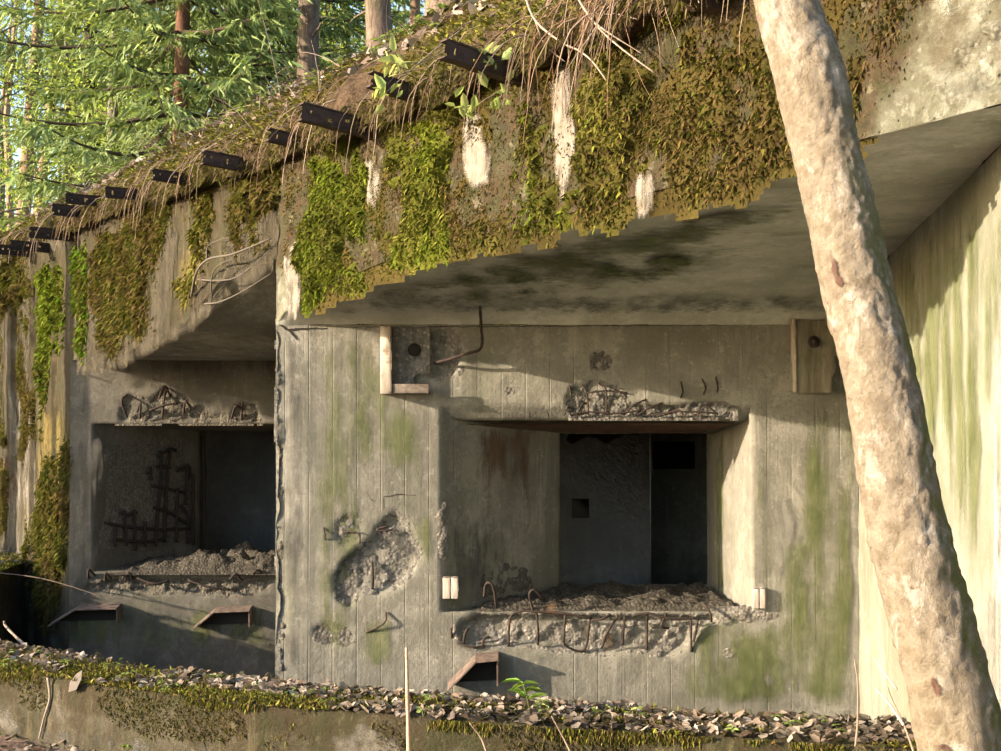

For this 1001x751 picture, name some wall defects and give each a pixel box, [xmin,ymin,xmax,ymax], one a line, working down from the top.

spalling [590,351,613,371]
spalling [564,377,719,419]
damp [923,354,933,441]
spalling [105,436,206,551]
spalling [312,612,387,648]
spalling [323,509,423,610]
spalling [435,502,448,560]
spalling [450,627,490,648]
spalling [479,563,779,653]
damp [979,481,1001,698]